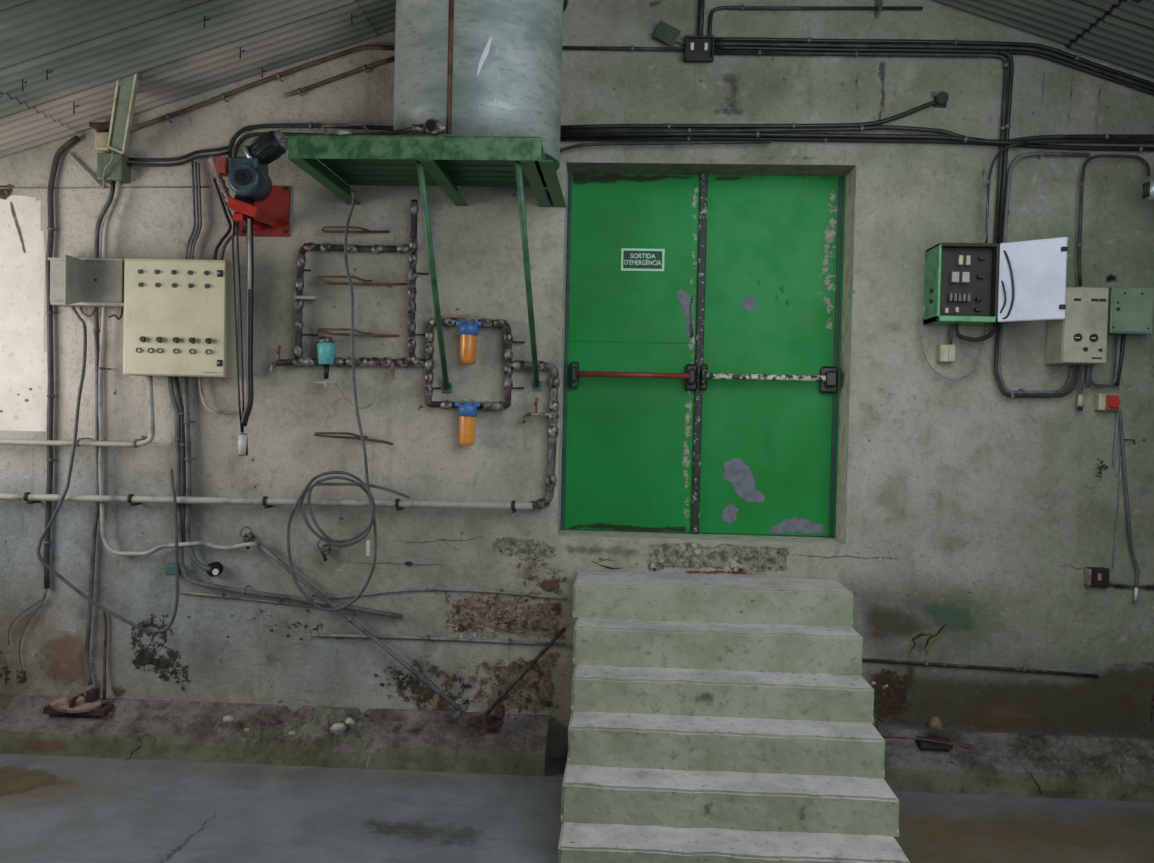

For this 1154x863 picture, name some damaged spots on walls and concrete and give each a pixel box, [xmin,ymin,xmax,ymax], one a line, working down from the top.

peeling [675,289,694,338]
peeling [722,458,765,524]
spalling [647,517,826,573]
flaking render [374,588,565,714]
damp [871,663,1154,738]